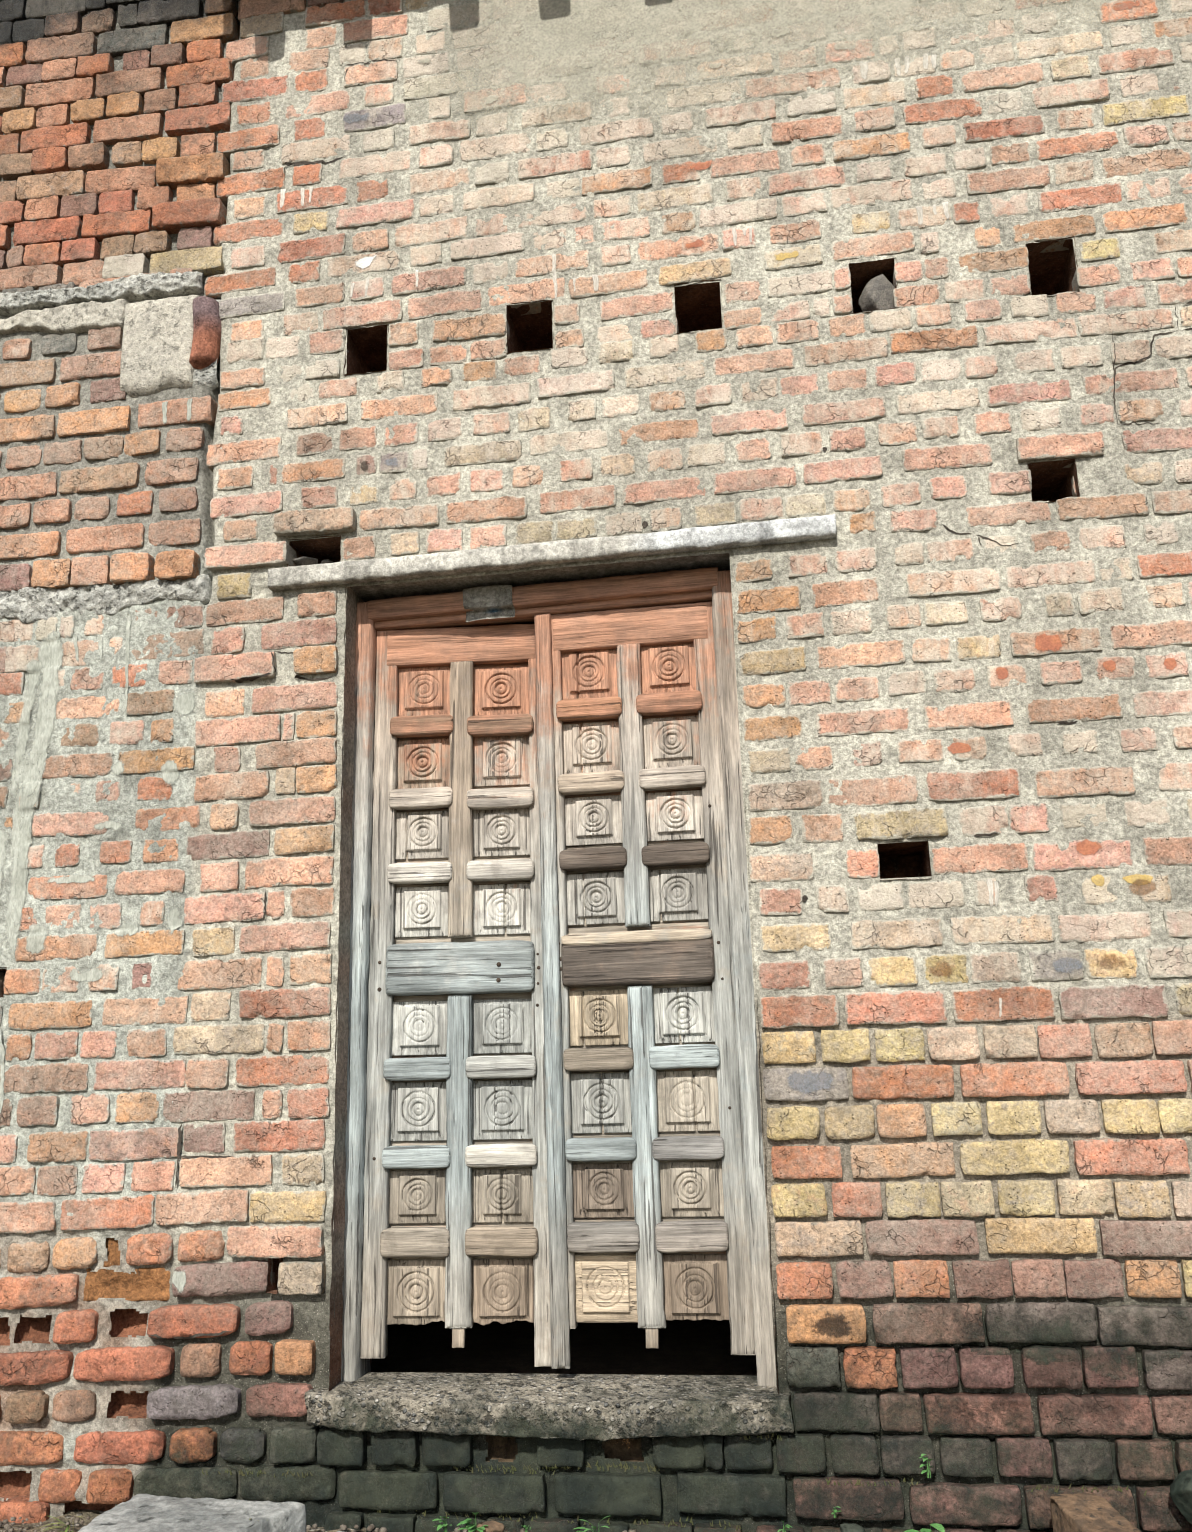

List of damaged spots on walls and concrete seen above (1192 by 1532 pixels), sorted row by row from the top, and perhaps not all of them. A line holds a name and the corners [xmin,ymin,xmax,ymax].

spalling [83,1238,170,1338]
spalling [0,1314,52,1346]
spalling [107,1391,149,1419]
spalling [0,1471,32,1497]